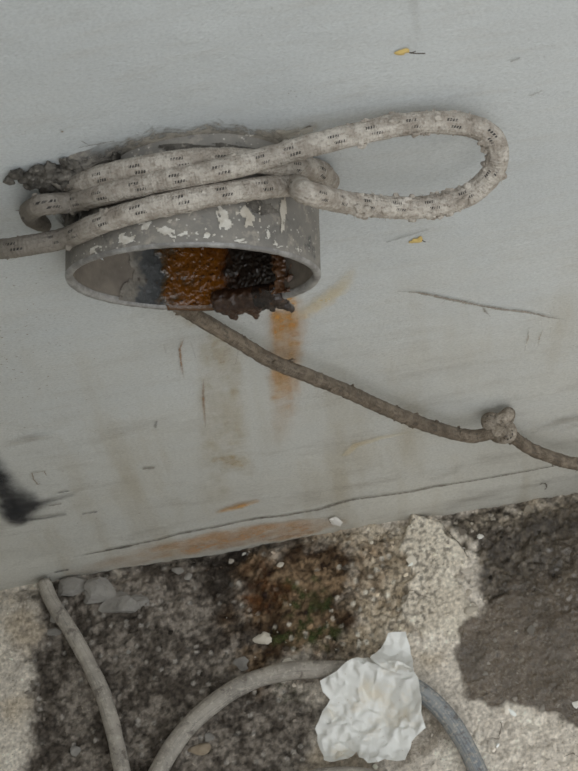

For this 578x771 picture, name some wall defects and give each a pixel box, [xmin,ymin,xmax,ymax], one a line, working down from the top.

peeling [118,197,287,248]
corrosion [156,247,240,306]